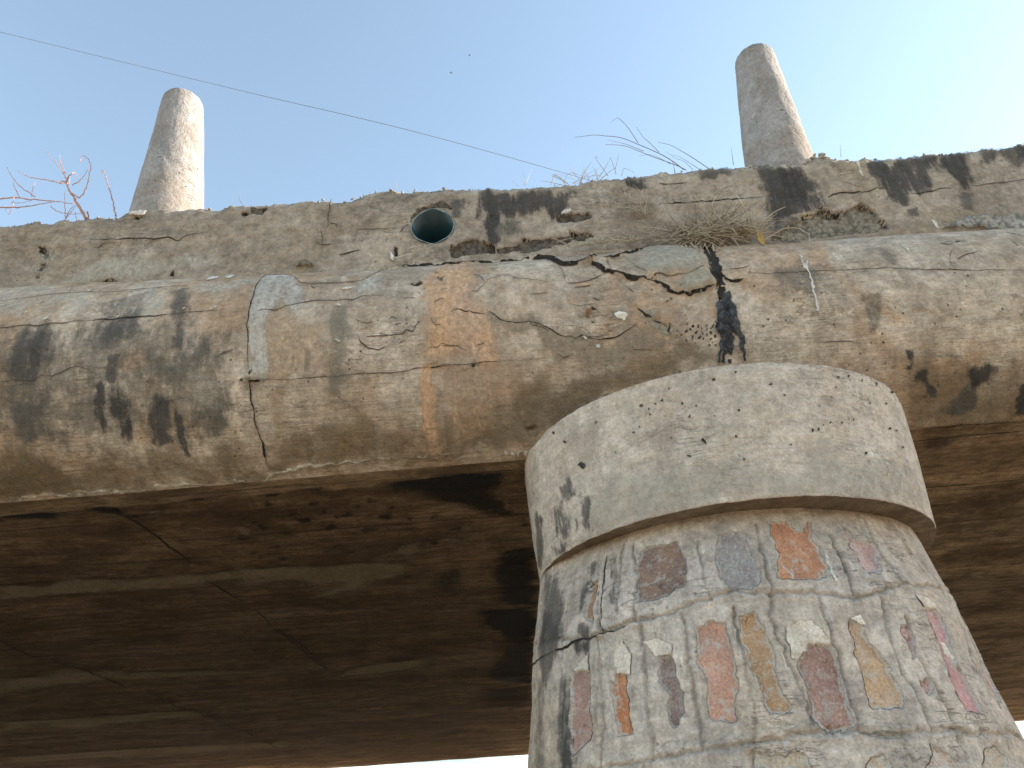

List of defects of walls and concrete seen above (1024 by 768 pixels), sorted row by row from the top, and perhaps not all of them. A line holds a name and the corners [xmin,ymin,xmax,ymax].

water stain [476,188,575,251]
water stain [754,165,825,241]
water stain [856,144,1024,215]
crack [0,366,91,382]
water stain [80,312,139,439]
corrosion [409,262,498,459]
crack [214,241,1024,469]
crack [531,557,625,666]
flaking render [635,540,687,602]
flaking render [770,520,828,580]
flaking render [609,640,634,737]
flaking render [695,611,792,722]